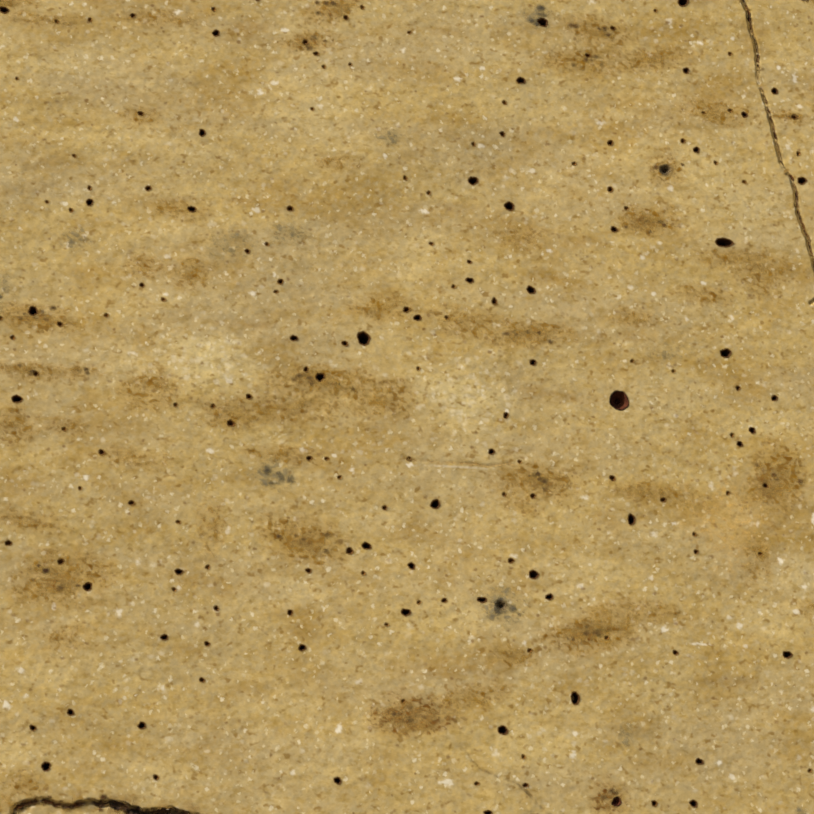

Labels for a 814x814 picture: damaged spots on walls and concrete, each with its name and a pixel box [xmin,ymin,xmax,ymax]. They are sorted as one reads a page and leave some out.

crack [742,0,814,267]
crack [12,795,193,814]